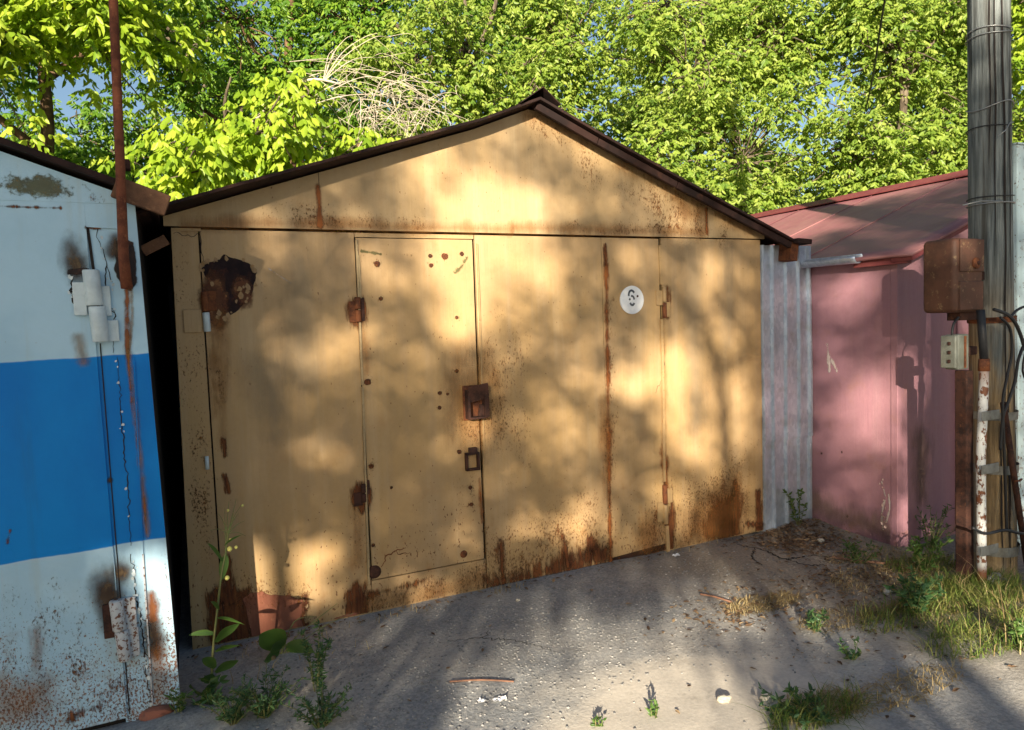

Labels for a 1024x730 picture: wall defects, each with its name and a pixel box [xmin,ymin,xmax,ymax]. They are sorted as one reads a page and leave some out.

rust [292,184,372,230]
rust [344,232,627,616]
rust [642,448,764,556]
rust [147,591,171,658]
rust [205,555,252,645]
rust [66,678,131,724]